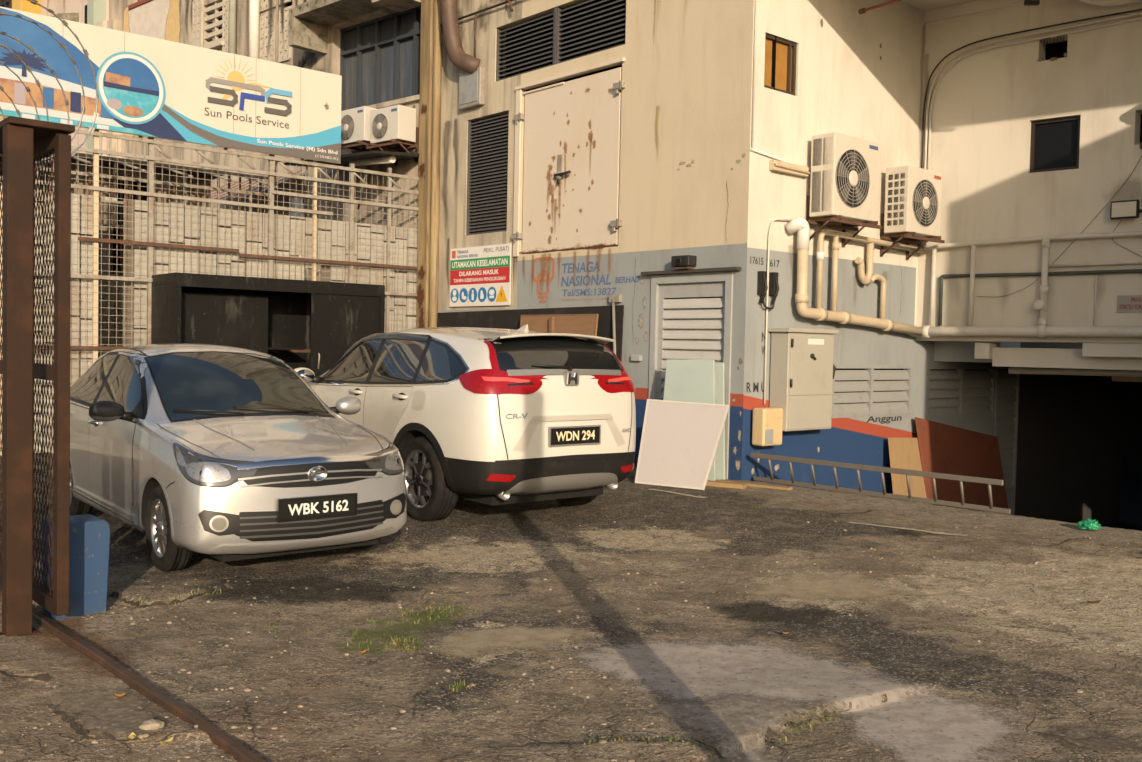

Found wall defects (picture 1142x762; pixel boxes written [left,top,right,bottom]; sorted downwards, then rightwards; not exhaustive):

corrosion [519,120,617,254]
crack [108,589,214,608]
crack [0,670,156,755]